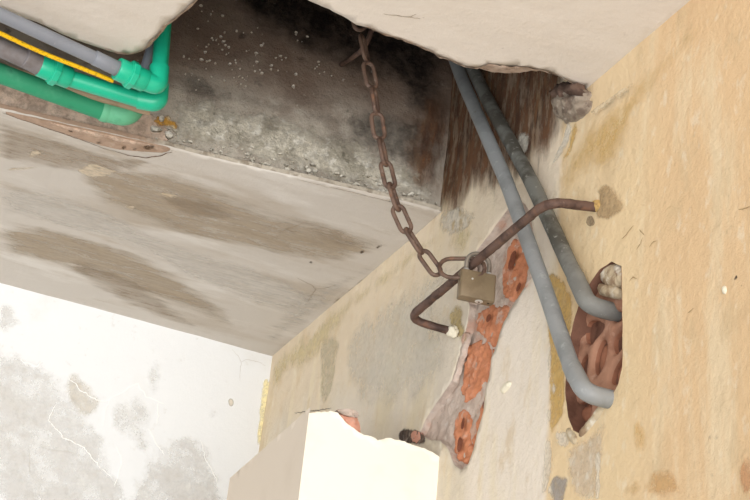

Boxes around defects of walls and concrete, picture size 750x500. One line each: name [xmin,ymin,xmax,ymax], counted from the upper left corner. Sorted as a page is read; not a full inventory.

leakage [9,194,322,308]
leakage [7,136,364,256]
spalling [0,0,573,208]
leakage [168,103,443,202]
corrosion [440,72,497,206]
corrosion [466,72,517,172]
corrosion [480,66,560,157]
spalling [589,262,622,300]
leakage [0,364,119,500]
flaking render [335,409,361,433]
spalling [399,234,532,468]
peeling [542,330,605,492]